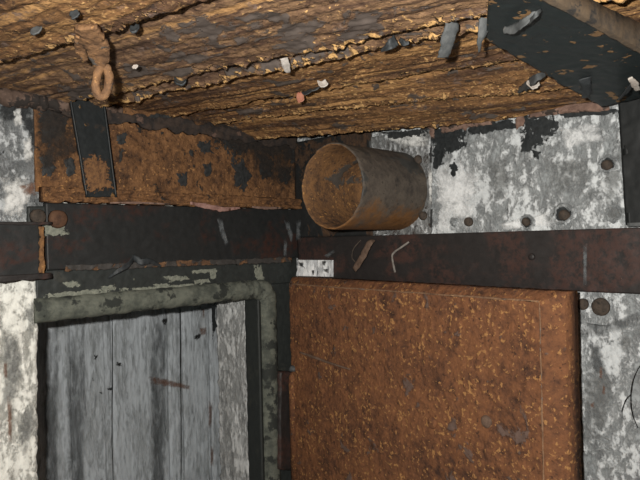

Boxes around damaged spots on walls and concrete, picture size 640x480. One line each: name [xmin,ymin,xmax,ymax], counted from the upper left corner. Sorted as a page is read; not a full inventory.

peeling [437,22,459,58]
peeling [477,17,488,53]
peeling [503,9,542,34]
peeling [280,57,291,73]
peeling [296,79,328,103]
peeling [517,72,546,94]
peeling [381,109,620,178]
rust [82,154,114,194]
peeling [197,137,295,192]
peeling [43,254,218,298]
rust [64,256,292,272]
peeling [253,264,264,280]